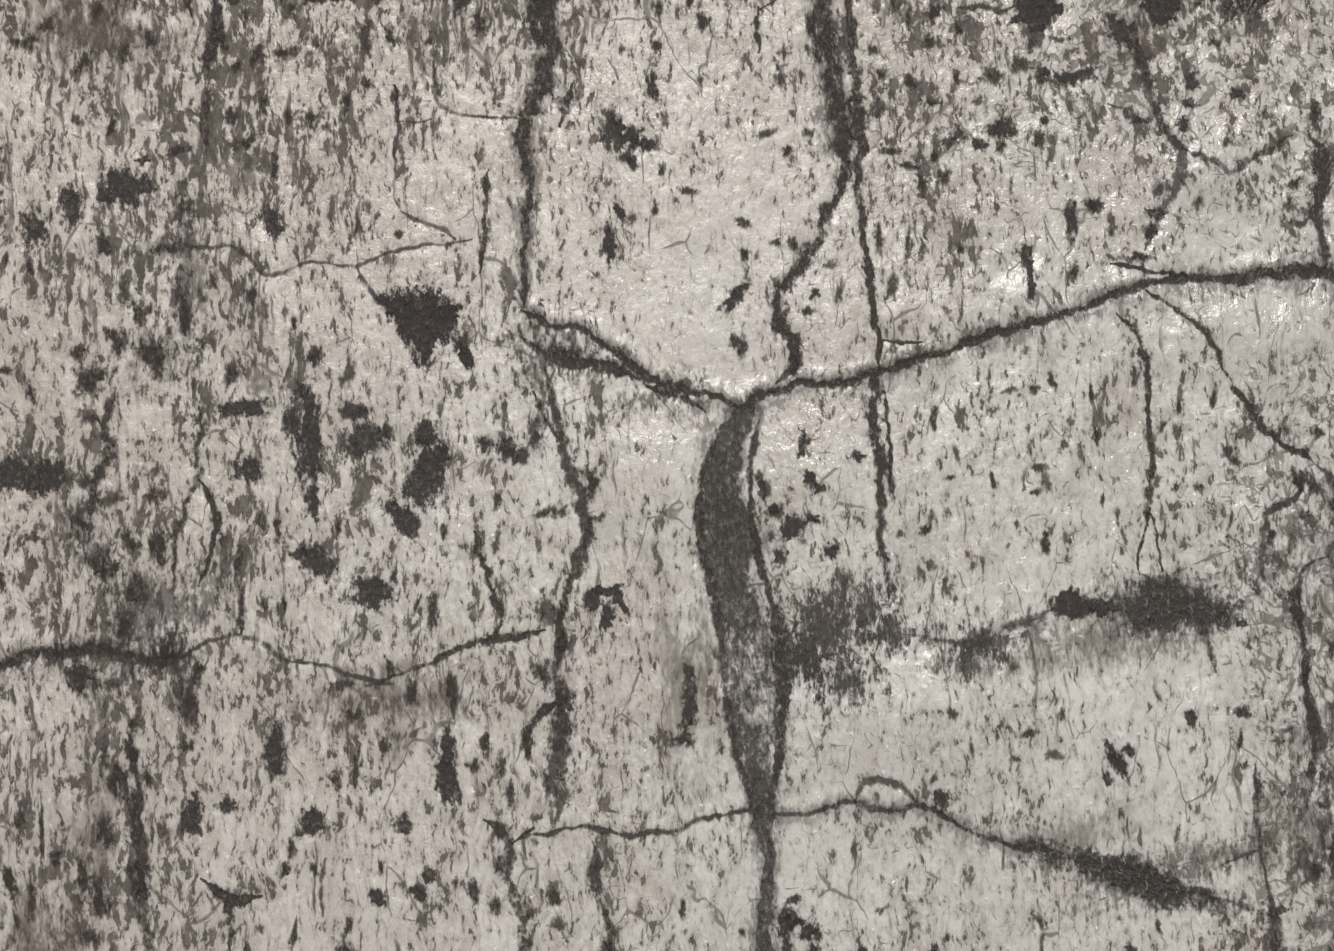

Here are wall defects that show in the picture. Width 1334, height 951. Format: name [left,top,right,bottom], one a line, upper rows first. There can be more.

crack [432,0,1334,951]
crack [0,530,546,682]
crack [116,734,154,951]
crack [200,877,263,951]
crack [318,858,326,917]